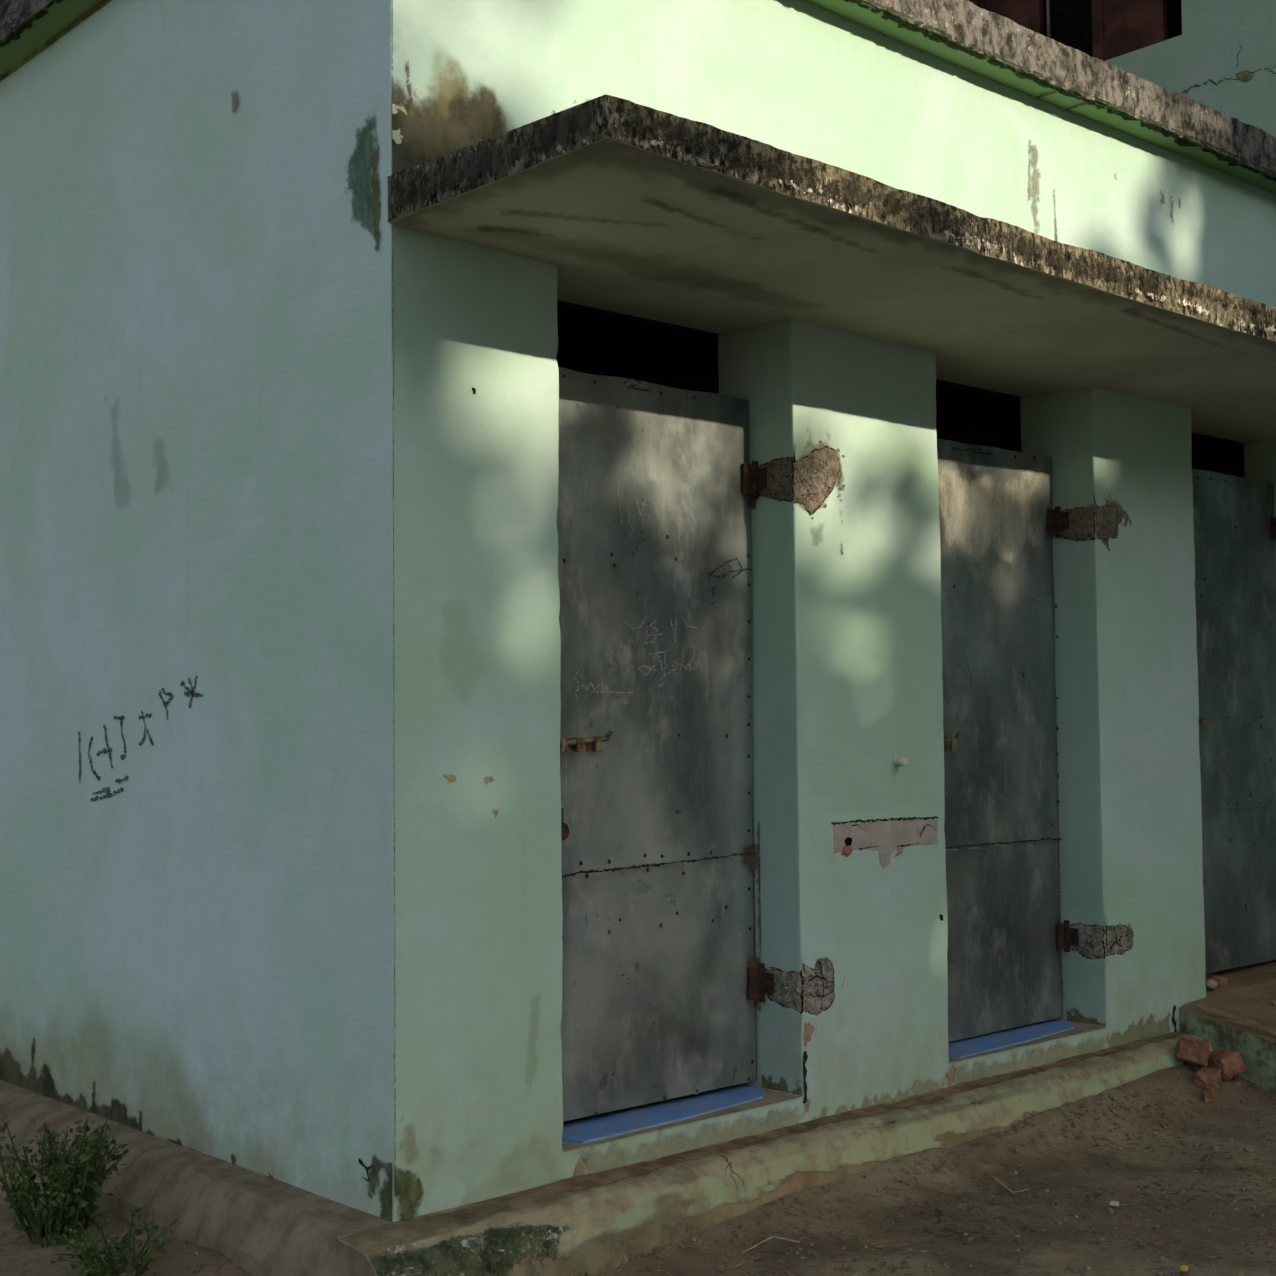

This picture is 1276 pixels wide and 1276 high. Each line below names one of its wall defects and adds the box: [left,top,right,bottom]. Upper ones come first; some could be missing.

crack [1182,41,1276,94]
water stain [371,61,593,250]
spalling [758,440,845,523]
spalling [1061,494,1132,551]
flaking render [824,808,943,879]
spalling [1061,908,1141,974]
spalling [755,938,847,1114]
water stain [0,1038,182,1146]
crack [719,1155,747,1193]